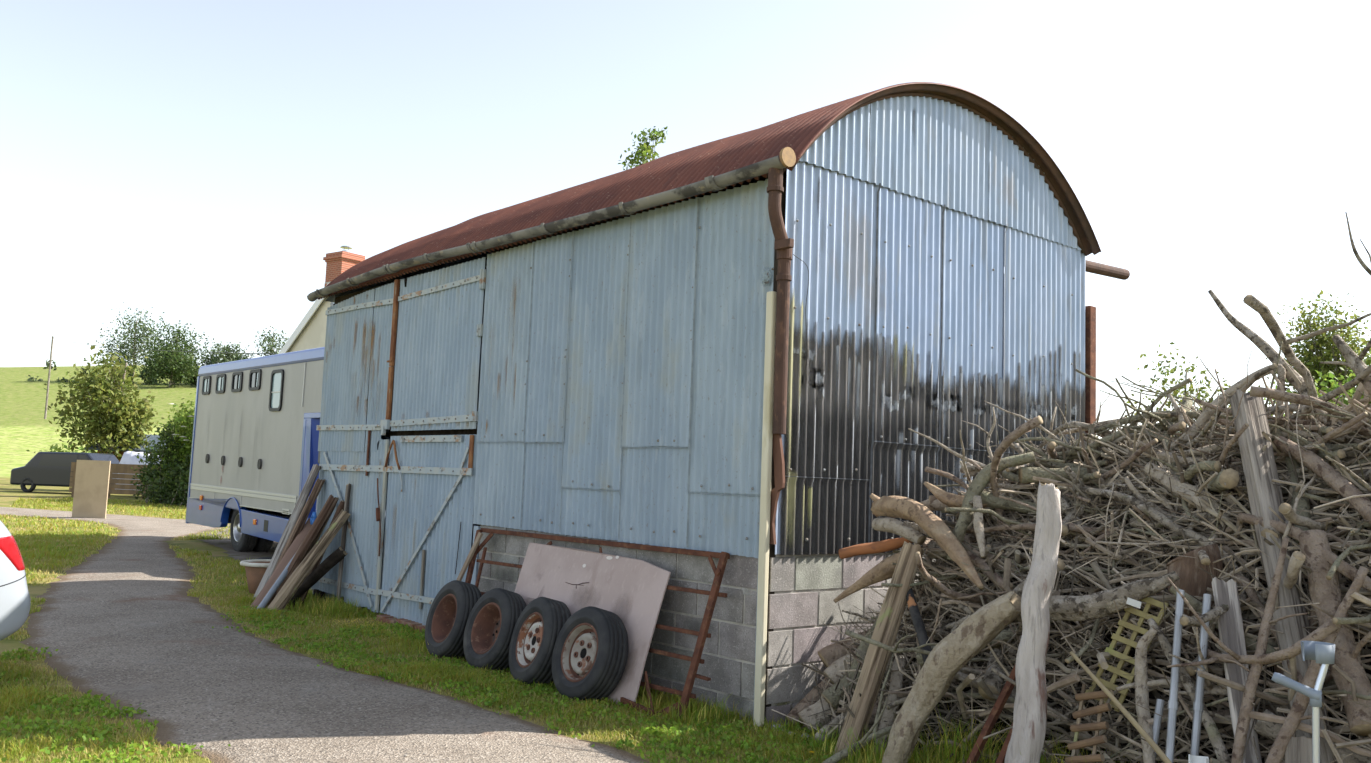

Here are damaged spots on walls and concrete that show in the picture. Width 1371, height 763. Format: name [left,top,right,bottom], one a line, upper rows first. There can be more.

damp [780,295,1085,555]